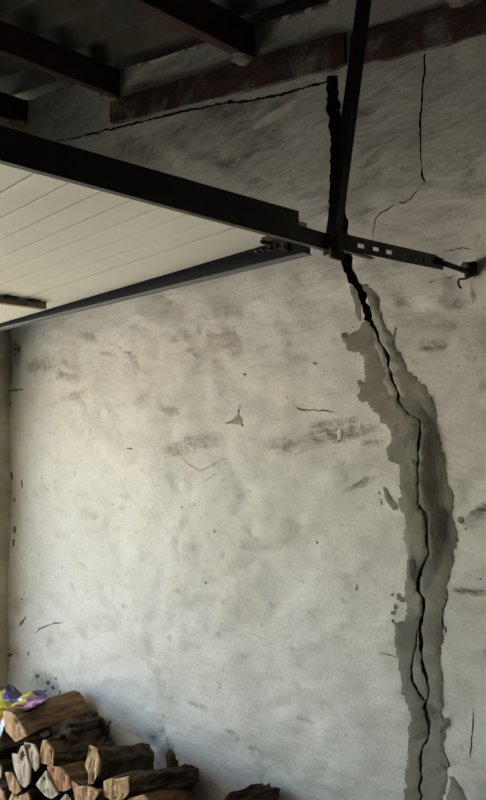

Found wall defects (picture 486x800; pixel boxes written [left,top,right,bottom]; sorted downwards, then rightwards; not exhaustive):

crack [57,76,349,234]
crack [372,54,426,238]
spalling [350,284,367,328]
spalling [225,409,244,426]
crack [165,453,226,483]
peeling [378,486,397,511]
crack [341,253,448,800]
peeling [390,593,405,623]
peeling [446,776,467,800]